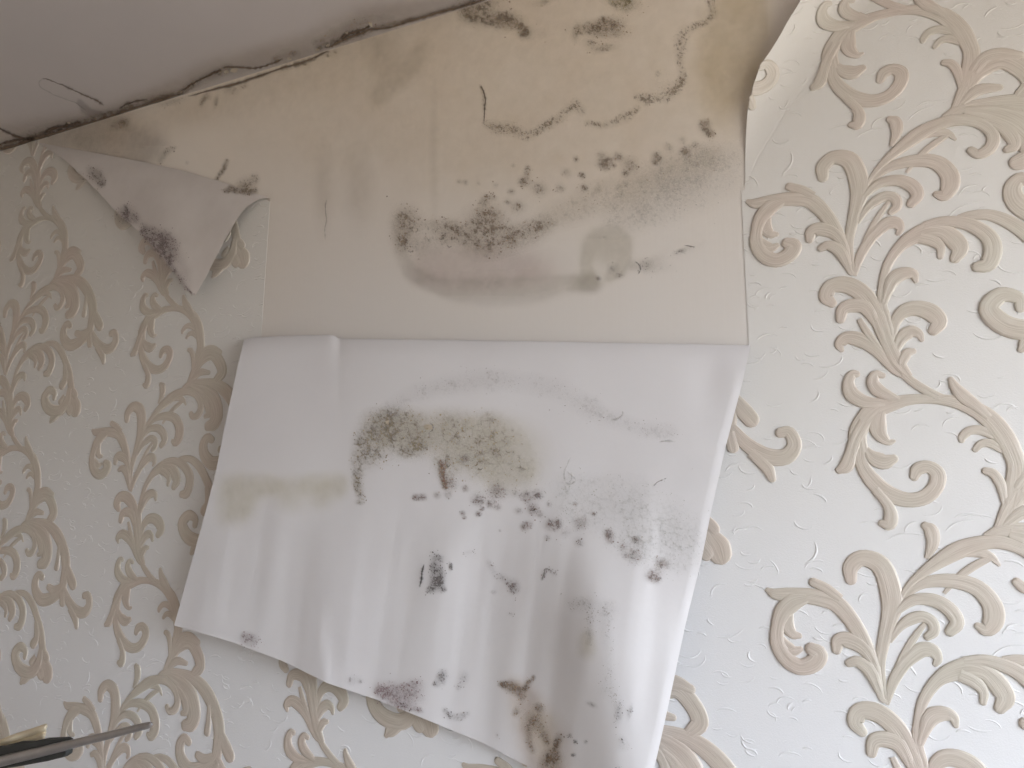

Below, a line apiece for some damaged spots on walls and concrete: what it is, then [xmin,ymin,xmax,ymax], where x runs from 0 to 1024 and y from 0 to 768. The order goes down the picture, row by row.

damp [313,0,537,49]
damp [565,0,649,53]
crack [0,0,484,150]
damp [389,119,719,260]
damp [116,201,192,296]
damp [353,383,700,582]
damp [427,550,453,594]
damp [349,672,445,711]
damp [497,677,578,768]